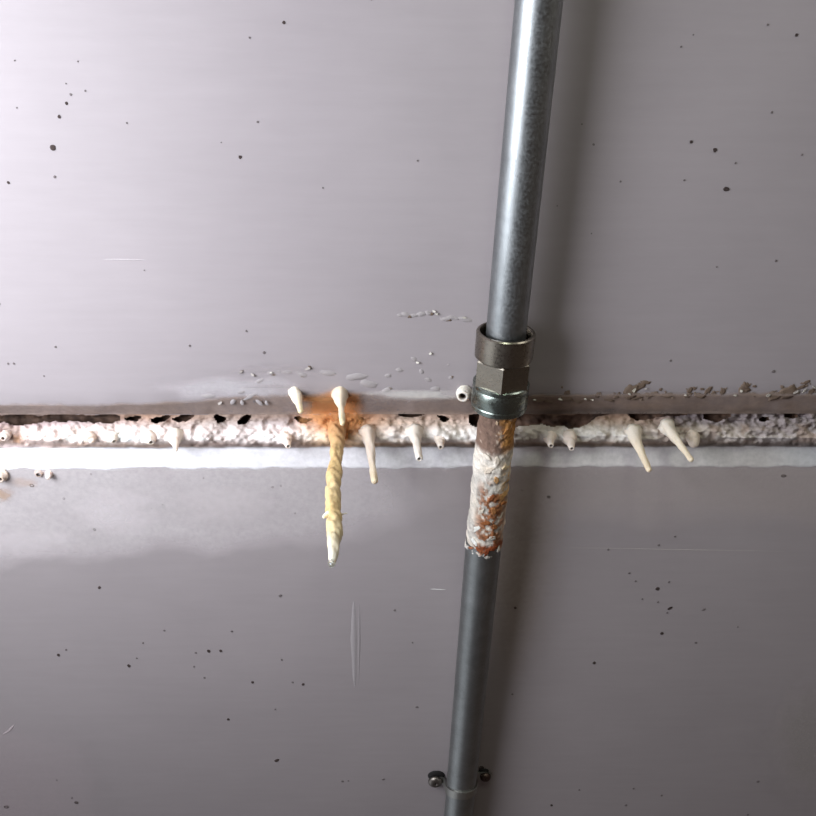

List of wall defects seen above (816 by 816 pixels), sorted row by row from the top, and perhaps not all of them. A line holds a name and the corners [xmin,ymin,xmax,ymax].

water stain [0,383,334,552]
rust [304,397,361,440]
water stain [341,392,478,517]
rust [465,415,517,559]
peeling [531,380,674,404]
water stain [511,393,816,467]
peeling [684,382,756,399]
peeling [766,380,816,402]